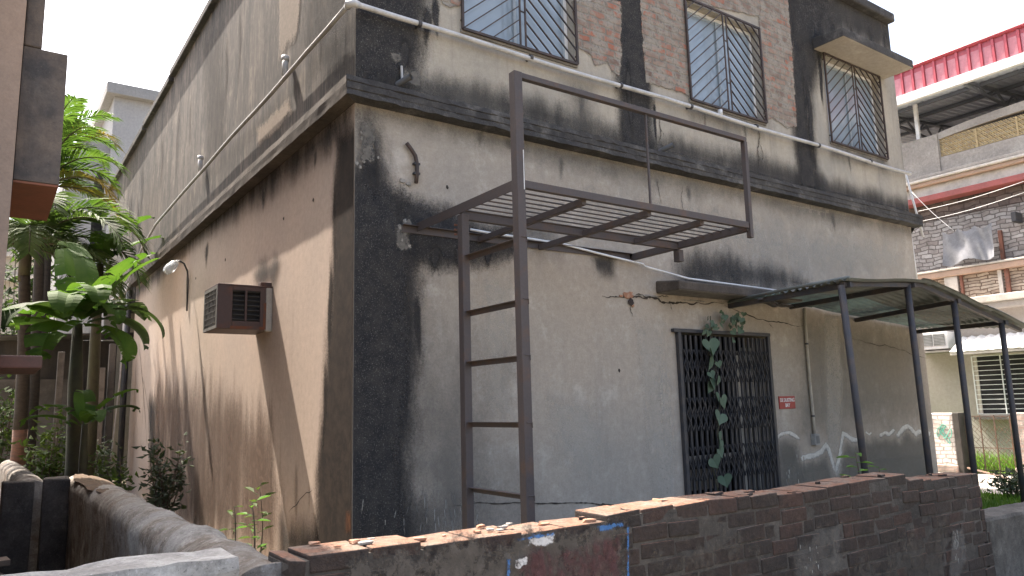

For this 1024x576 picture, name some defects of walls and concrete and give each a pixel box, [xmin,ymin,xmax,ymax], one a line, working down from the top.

leakage [523,0,909,212]
spalling [640,0,797,128]
leakage [135,111,514,553]
crack [604,293,800,327]